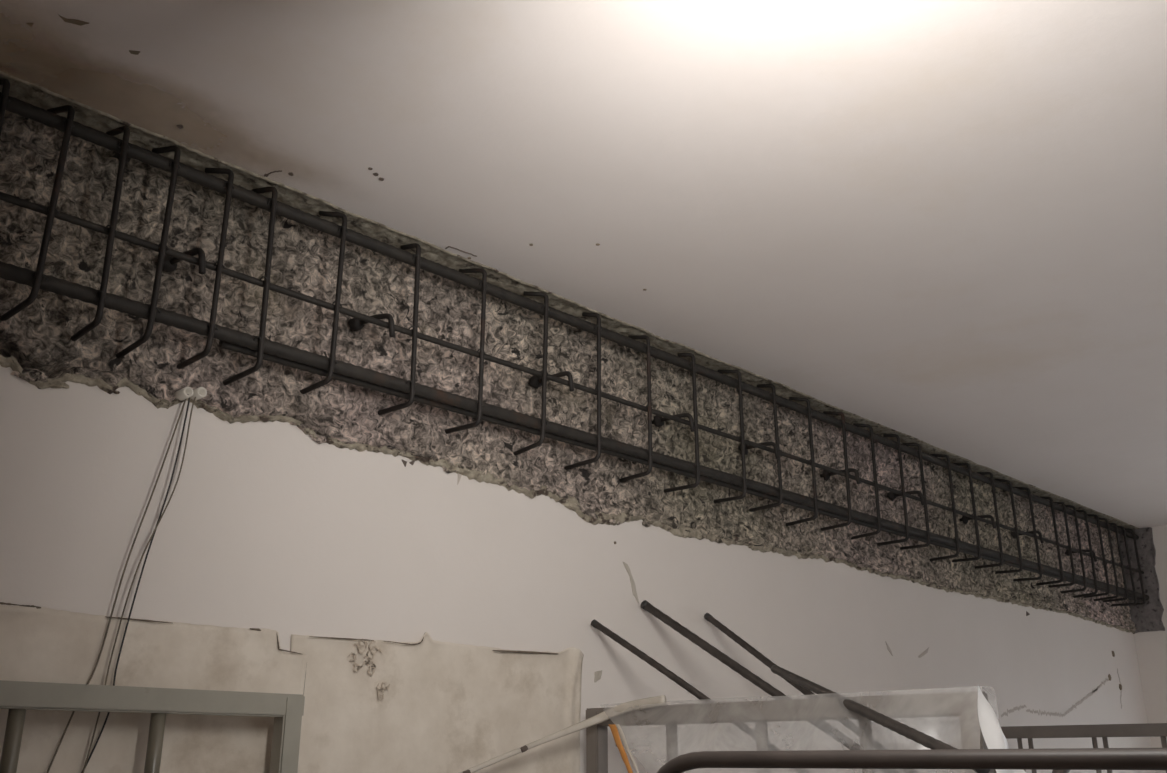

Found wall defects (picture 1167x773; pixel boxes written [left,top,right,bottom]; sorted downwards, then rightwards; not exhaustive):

spalling [0,70,1165,634]